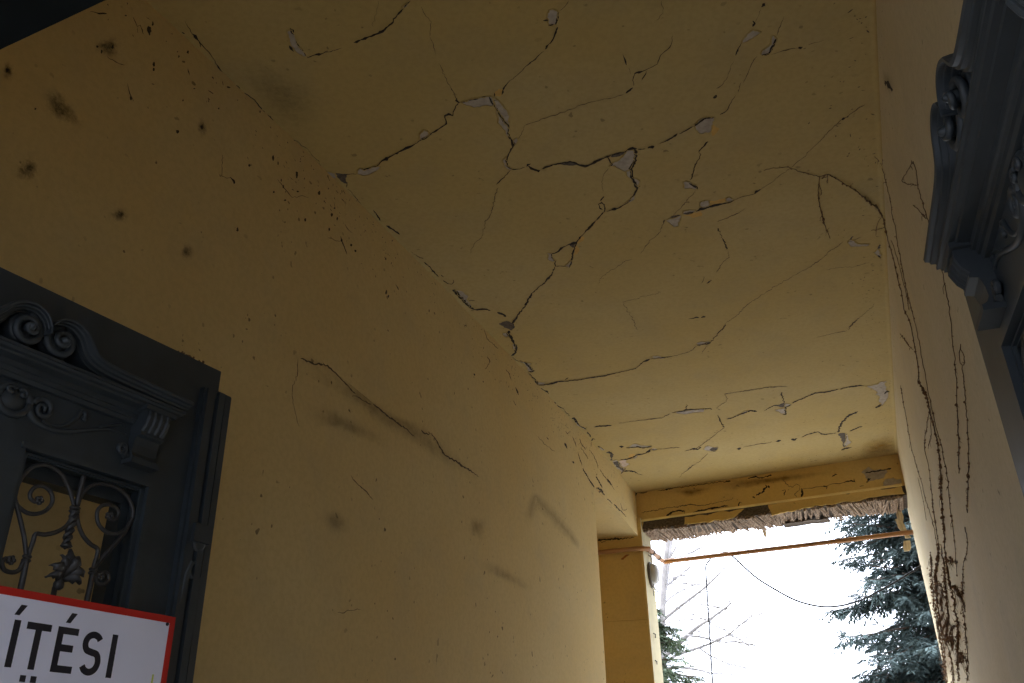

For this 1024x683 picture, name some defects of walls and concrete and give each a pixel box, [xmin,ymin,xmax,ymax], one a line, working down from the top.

crack [182,24,273,120]
crack [286,1,867,543]